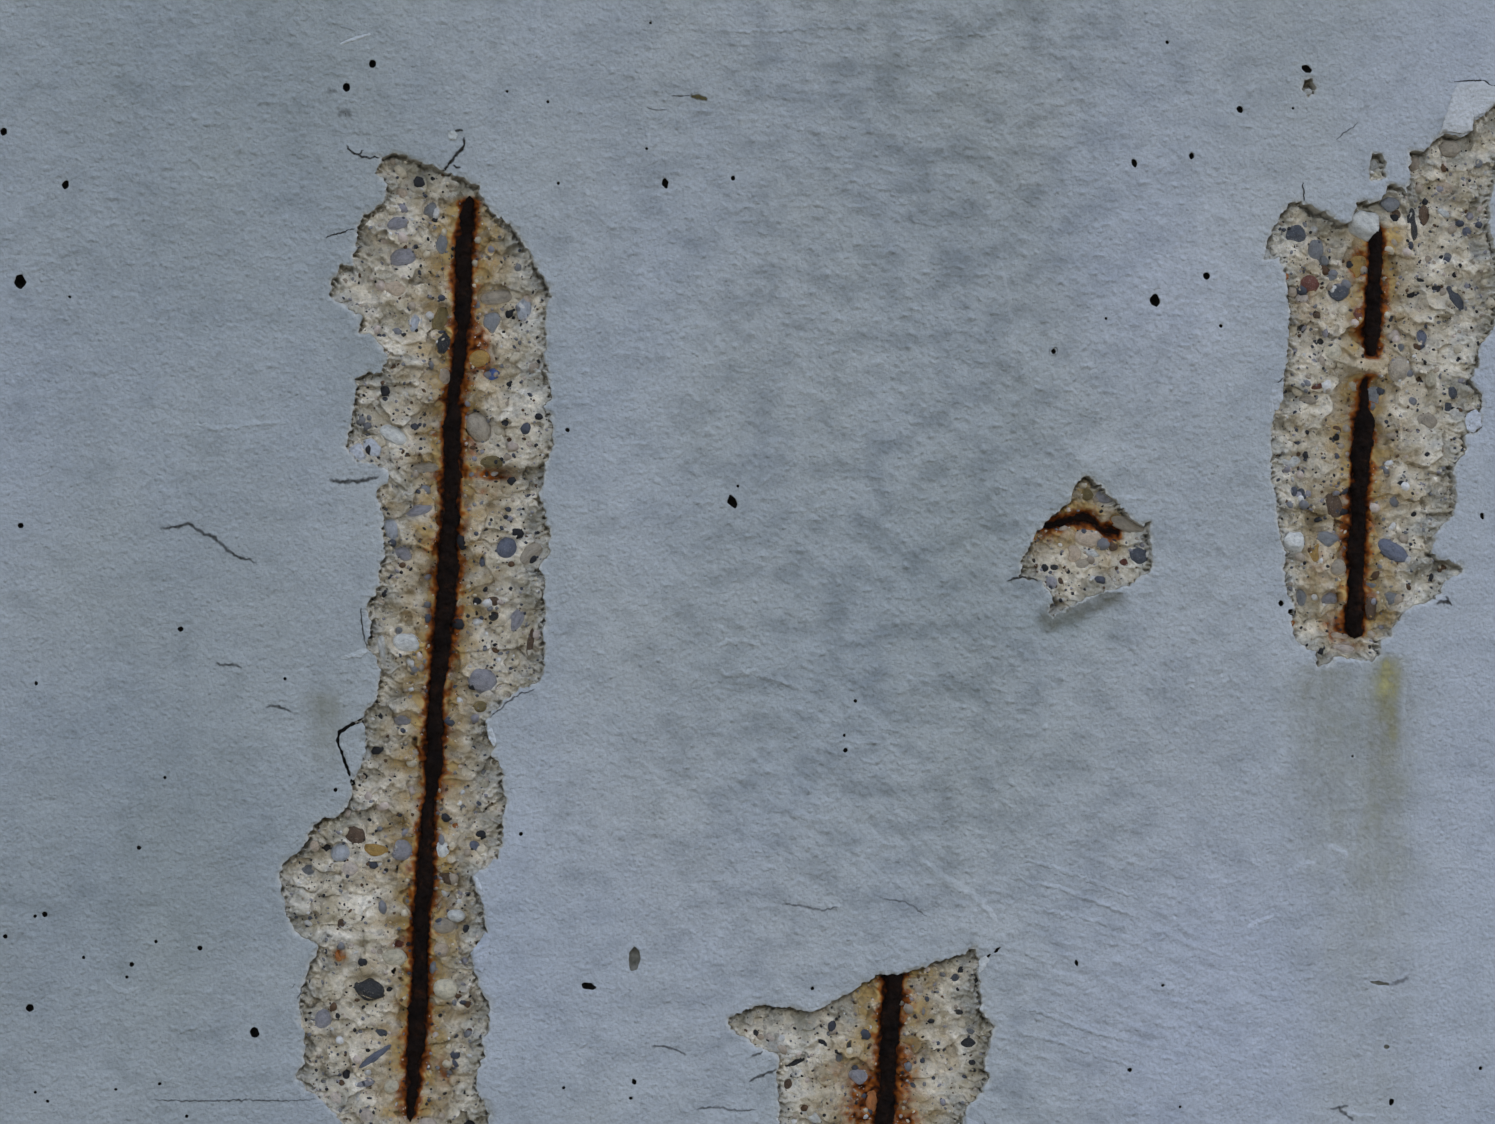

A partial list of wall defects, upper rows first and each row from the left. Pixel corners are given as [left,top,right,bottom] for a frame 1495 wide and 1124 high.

corrosion [1033,488,1123,545]
spalling [1019,477,1152,616]
corrosion [1322,225,1403,642]
spalling [1263,81,1495,667]
spalling [279,155,554,1124]
corrosion [382,197,510,1119]
spalling [728,974,883,1124]
corrosion [844,968,934,1124]
spalling [895,949,994,1124]